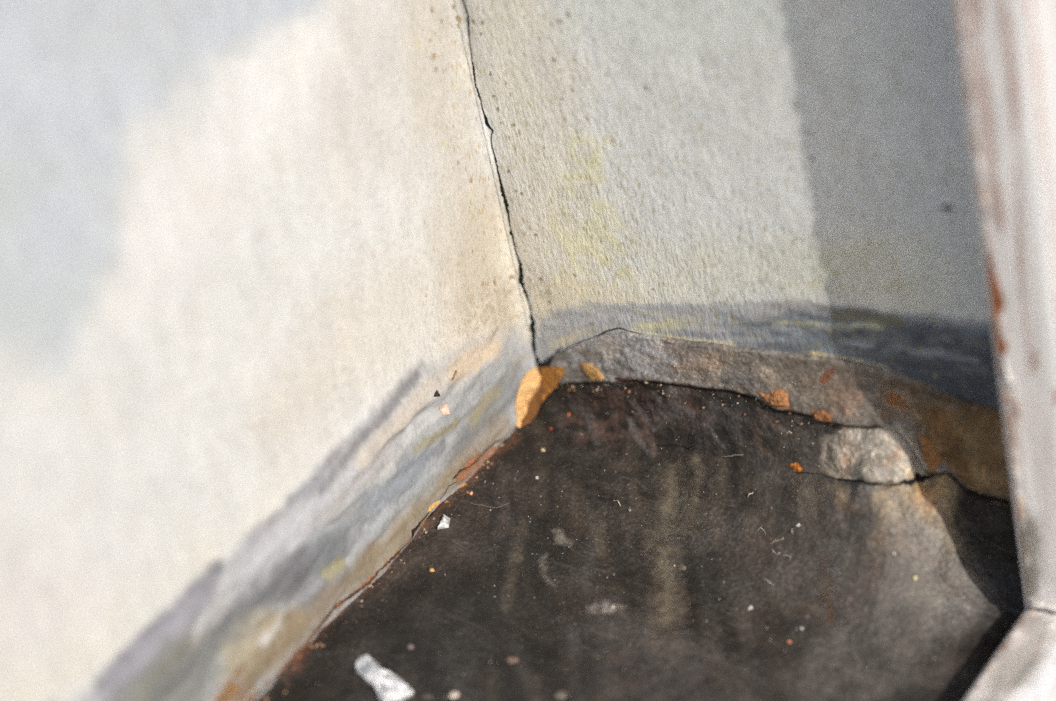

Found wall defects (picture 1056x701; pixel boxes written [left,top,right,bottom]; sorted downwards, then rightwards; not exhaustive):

crack [463,0,640,367]
flaking render [515,366,565,428]
flaking render [579,363,605,381]
crack [798,471,1011,505]